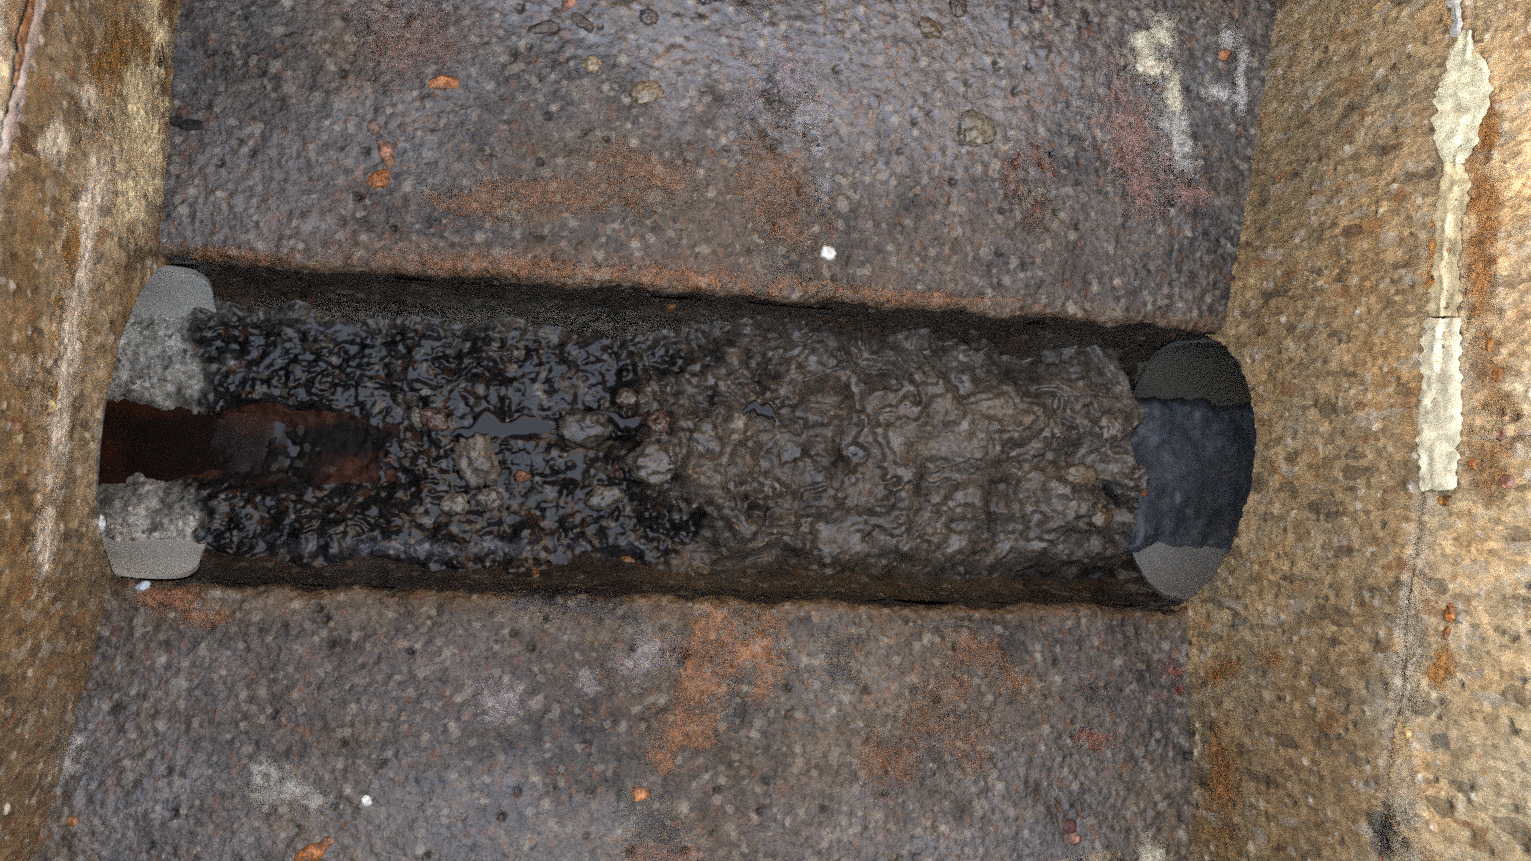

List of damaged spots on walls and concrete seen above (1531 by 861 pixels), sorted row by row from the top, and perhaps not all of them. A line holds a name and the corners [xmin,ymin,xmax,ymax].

rust [4,0,27,35]
rust [435,178,603,219]
rust [650,602,782,774]